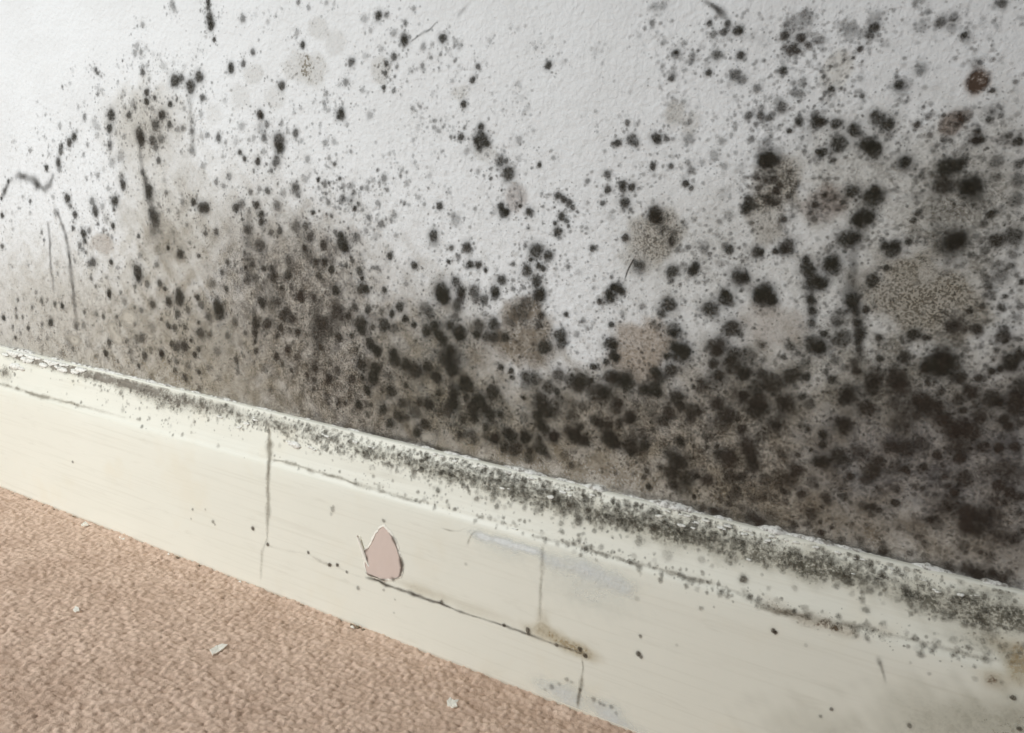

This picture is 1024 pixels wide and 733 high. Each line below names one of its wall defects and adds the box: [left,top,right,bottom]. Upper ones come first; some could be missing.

damp [382,21,408,92]
damp [778,32,812,74]
damp [852,22,879,59]
damp [107,71,204,163]
damp [745,102,786,121]
damp [4,110,1024,632]
peeling [357,524,404,582]
crack [373,578,448,607]